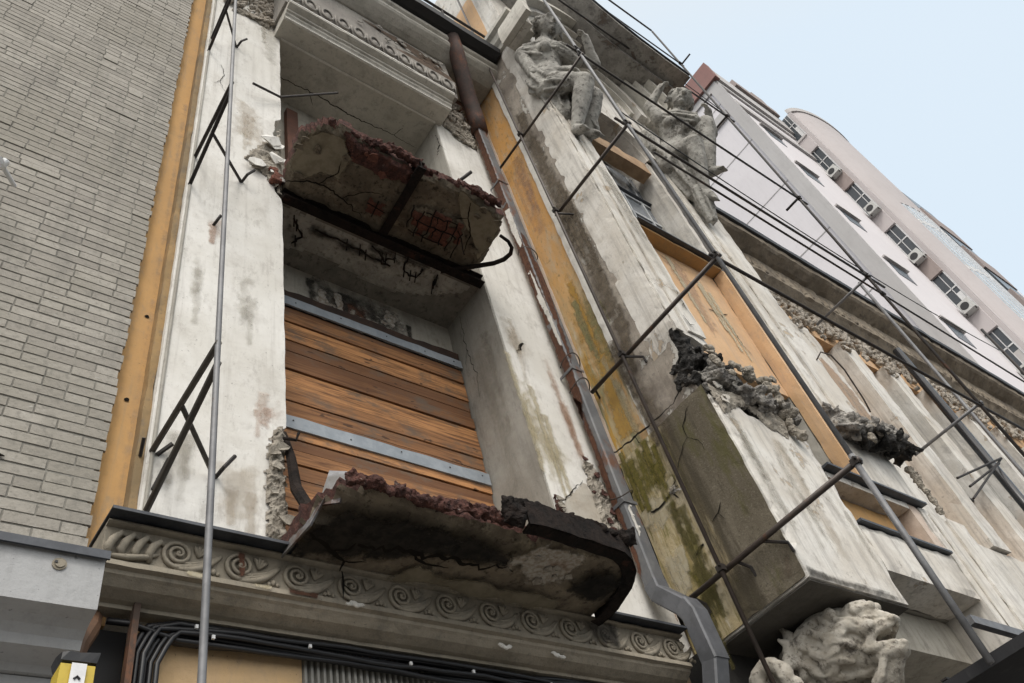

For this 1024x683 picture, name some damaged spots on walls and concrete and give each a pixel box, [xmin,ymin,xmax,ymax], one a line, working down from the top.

spalling [442,108,477,150]
crack [286,164,383,218]
spalling [244,130,470,296]
peeling [459,191,522,260]
flaking render [263,426,295,540]
flaking render [553,456,641,536]
leakage [517,112,735,670]
crack [614,379,703,513]
spalling [669,328,809,442]
spalling [819,358,945,515]
crack [309,533,513,598]
peeling [509,545,586,586]